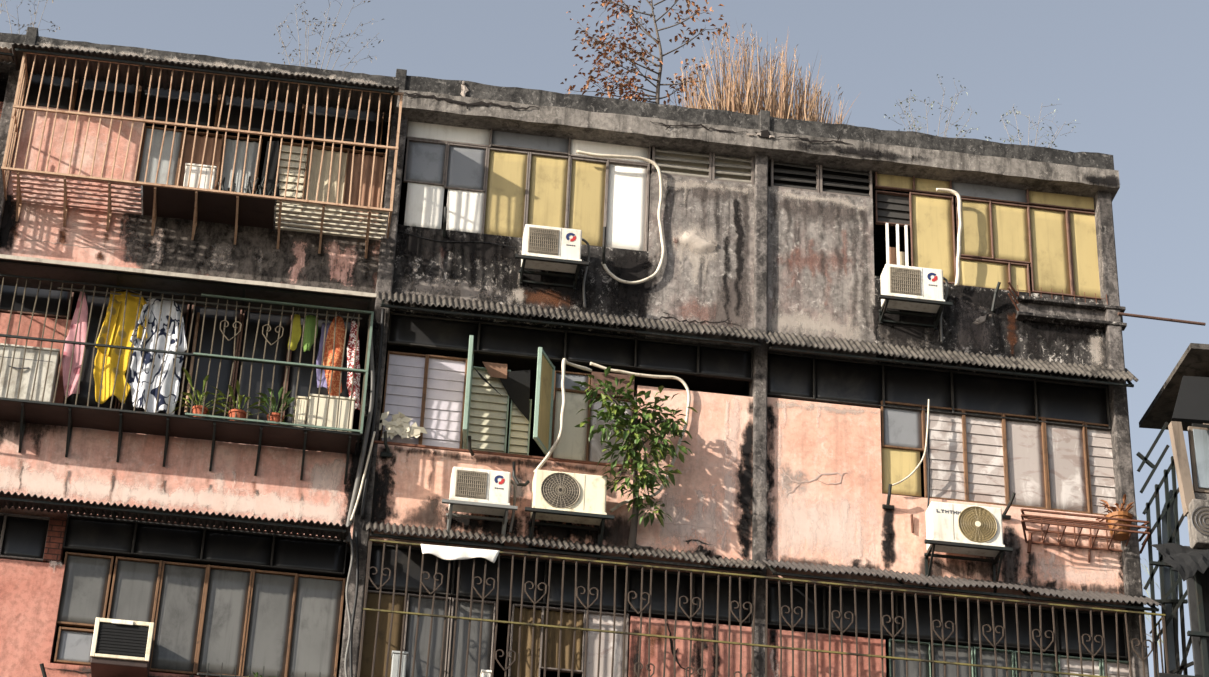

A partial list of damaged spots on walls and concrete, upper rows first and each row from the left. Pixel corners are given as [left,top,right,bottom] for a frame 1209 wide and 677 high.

damp [663,178,753,329]
damp [120,192,657,547]
damp [706,399,895,579]
crack [782,469,848,496]